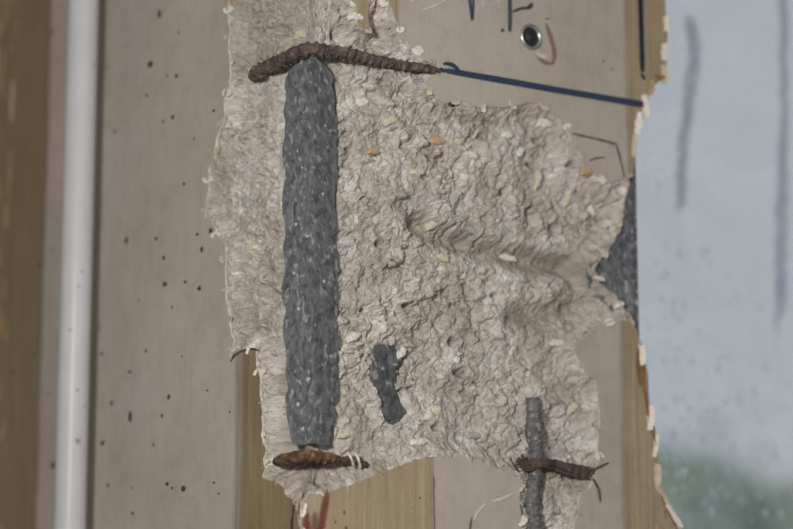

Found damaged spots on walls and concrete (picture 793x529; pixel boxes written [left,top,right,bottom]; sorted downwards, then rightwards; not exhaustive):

spalling [200,0,635,529]